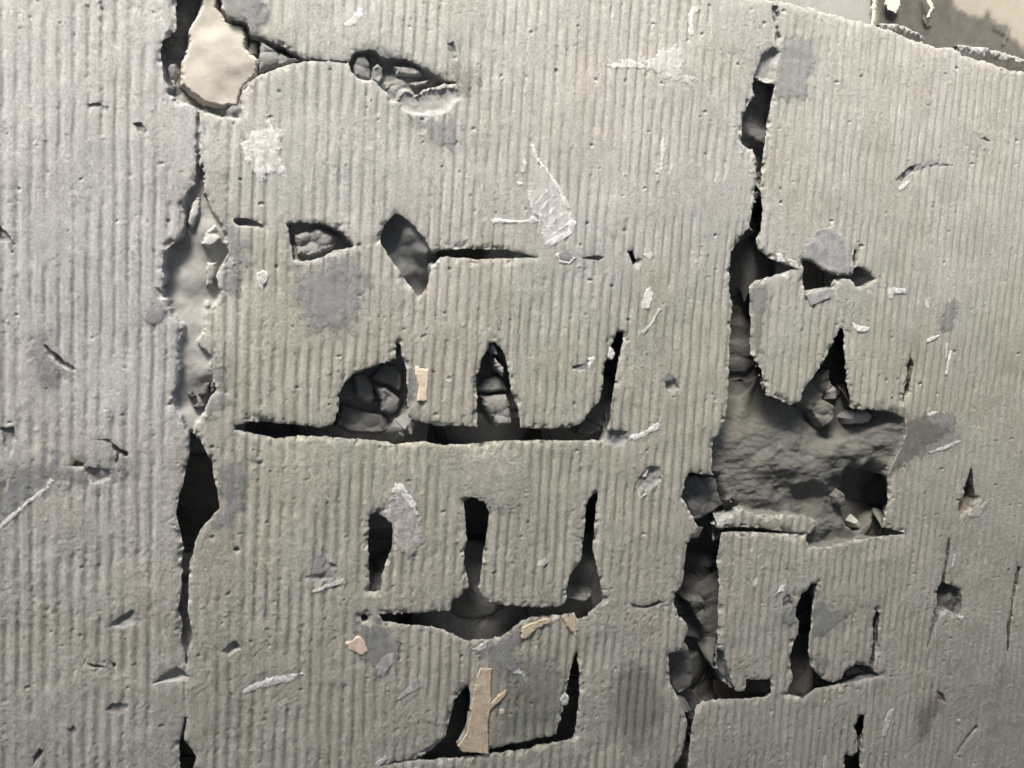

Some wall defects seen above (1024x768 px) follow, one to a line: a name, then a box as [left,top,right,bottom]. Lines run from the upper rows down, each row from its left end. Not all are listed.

spalling [398,87,461,116]
crack [734,77,775,248]
crack [437,248,534,260]
spalling [711,328,906,548]
spalling [361,492,603,641]
crack [927,540,962,647]
peeling [706,644,734,687]